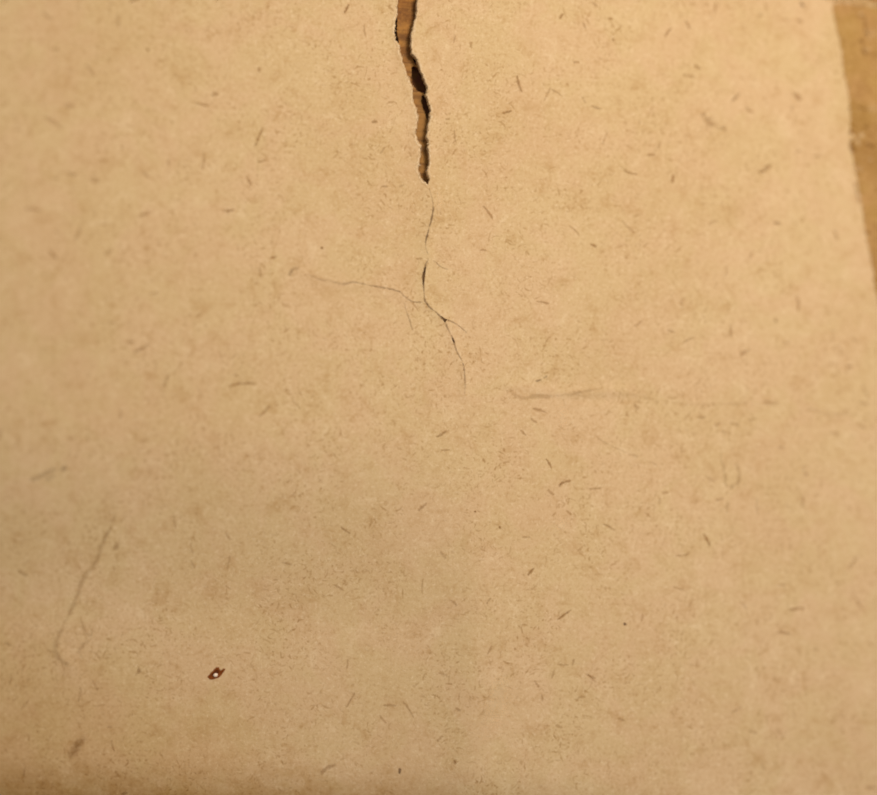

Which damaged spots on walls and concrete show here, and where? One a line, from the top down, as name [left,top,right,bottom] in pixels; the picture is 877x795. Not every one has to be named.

crack [392,0,433,185]